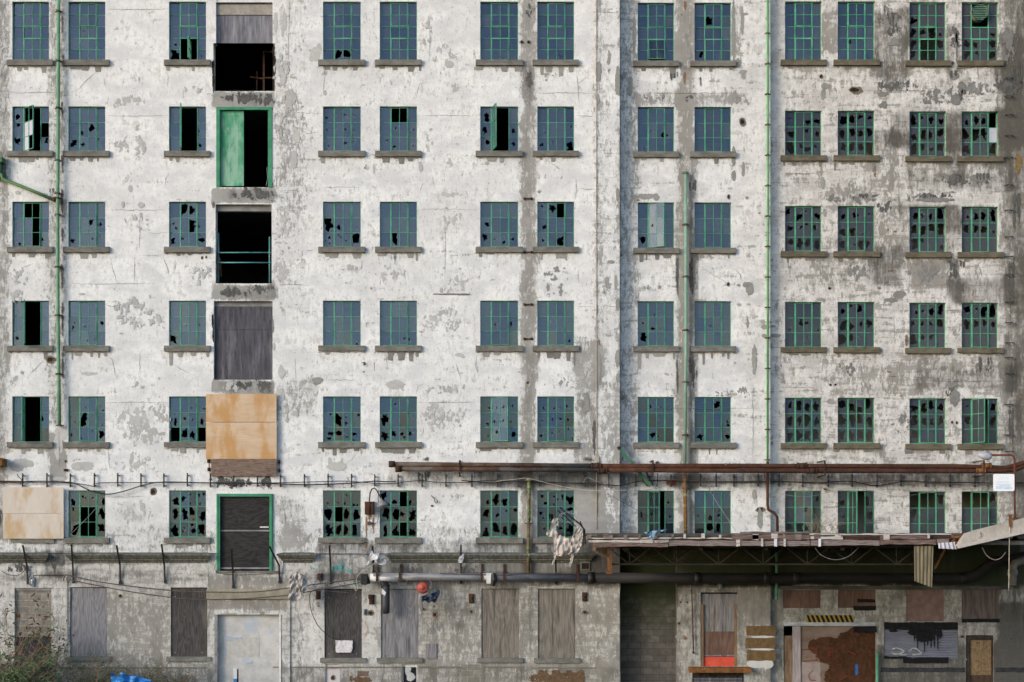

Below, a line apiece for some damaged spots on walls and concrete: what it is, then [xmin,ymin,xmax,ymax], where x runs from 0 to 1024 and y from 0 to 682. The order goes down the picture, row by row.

peeling [272,10,303,157]
leakage [878,80,918,91]
leakage [993,61,1023,95]
peeling [783,162,875,205]
leakage [907,173,990,199]
peeling [111,296,164,334]
leakage [1008,359,1017,450]
peeling [7,402,206,481]